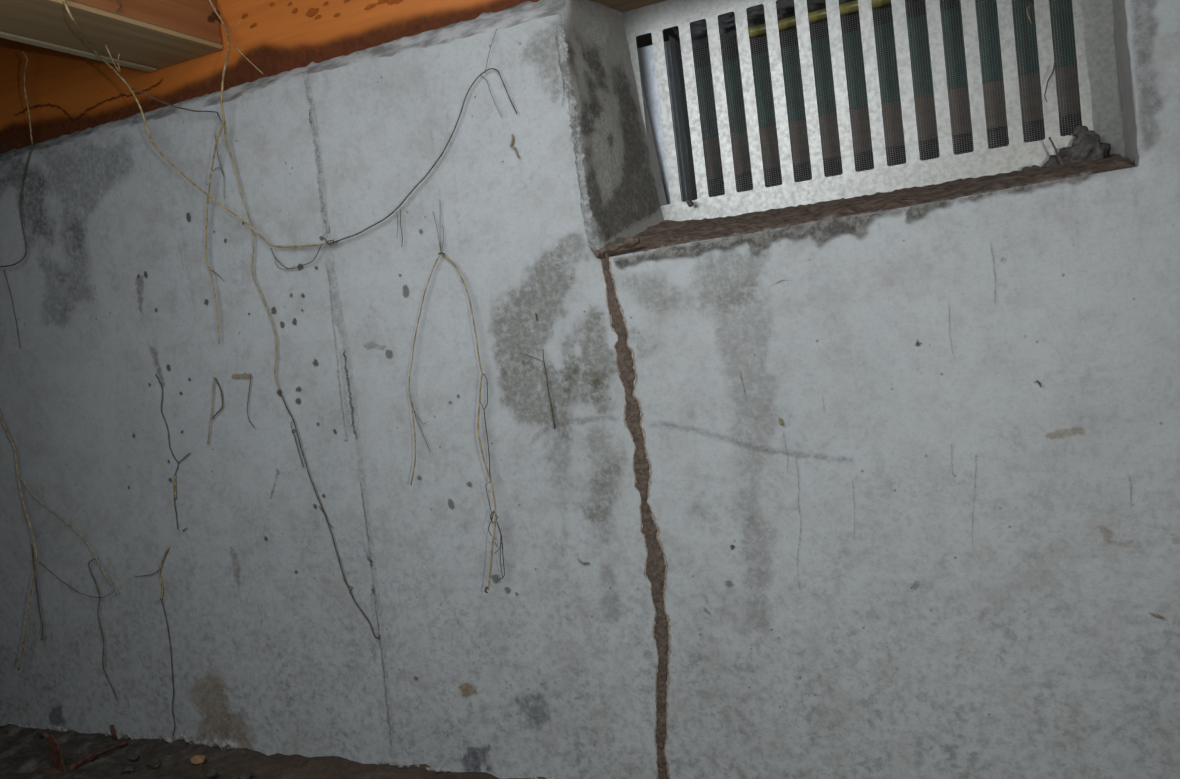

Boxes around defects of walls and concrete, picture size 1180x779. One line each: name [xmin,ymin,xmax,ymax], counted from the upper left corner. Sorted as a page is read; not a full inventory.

leakage [0,0,540,153]
leakage [568,20,659,239]